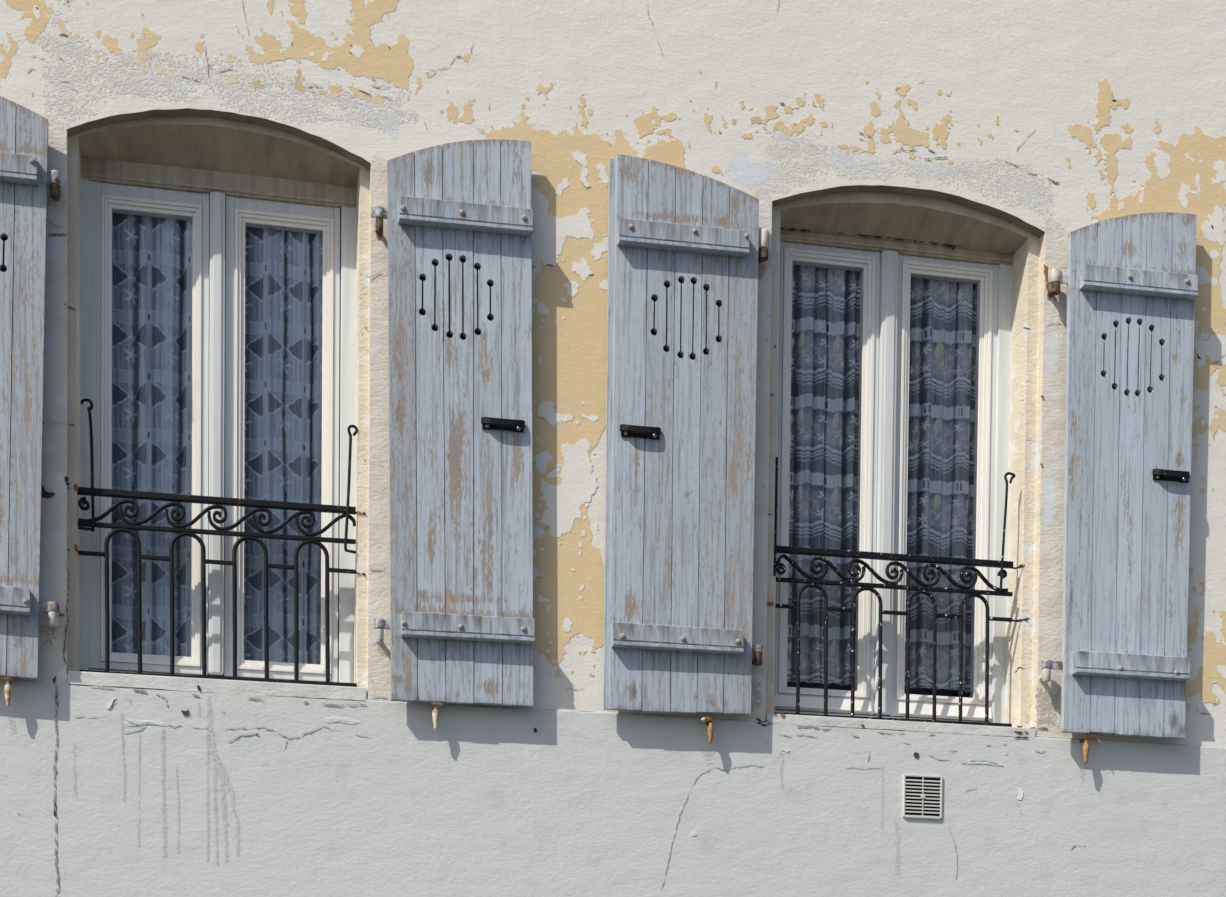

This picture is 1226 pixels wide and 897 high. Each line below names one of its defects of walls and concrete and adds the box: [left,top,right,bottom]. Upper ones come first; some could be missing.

peeling [0,0,79,78]
peeling [91,13,178,79]
peeling [223,0,436,104]
peeling [689,92,833,147]
peeling [837,81,960,164]
peeling [1067,79,1226,461]
peeling [440,82,692,677]
peeling [1186,568,1226,713]
crack [53,568,70,897]
crack [90,685,200,733]
crack [715,695,904,770]
crack [986,727,1048,754]